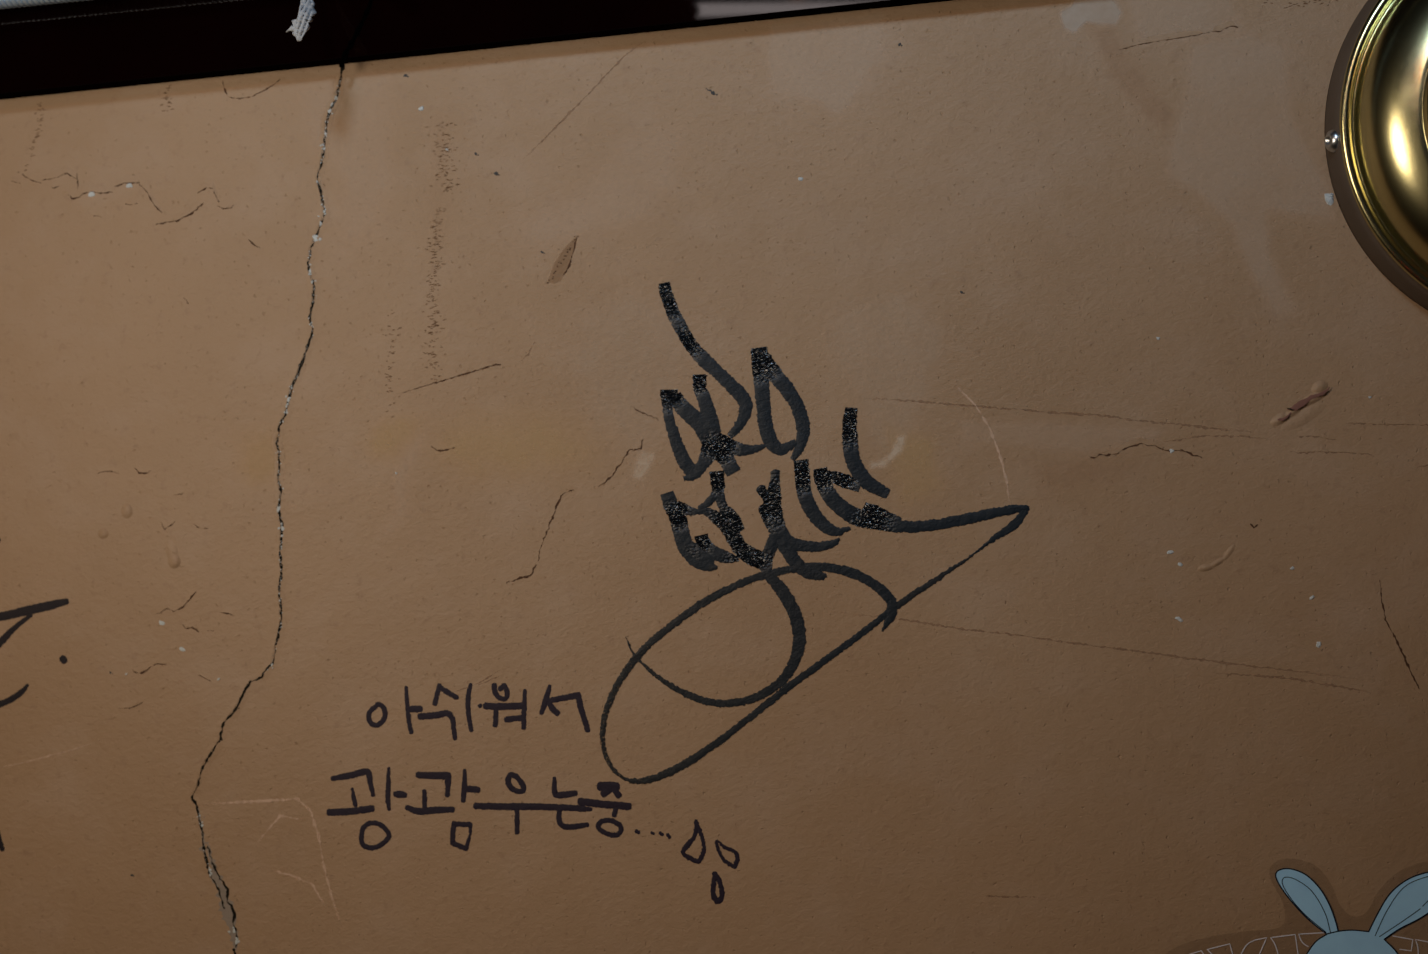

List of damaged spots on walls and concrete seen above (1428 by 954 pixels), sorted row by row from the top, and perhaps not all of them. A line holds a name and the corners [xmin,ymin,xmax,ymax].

crack [11,165,234,225]
crack [118,0,373,954]
crack [506,408,659,584]
hole [1270,380,1330,431]